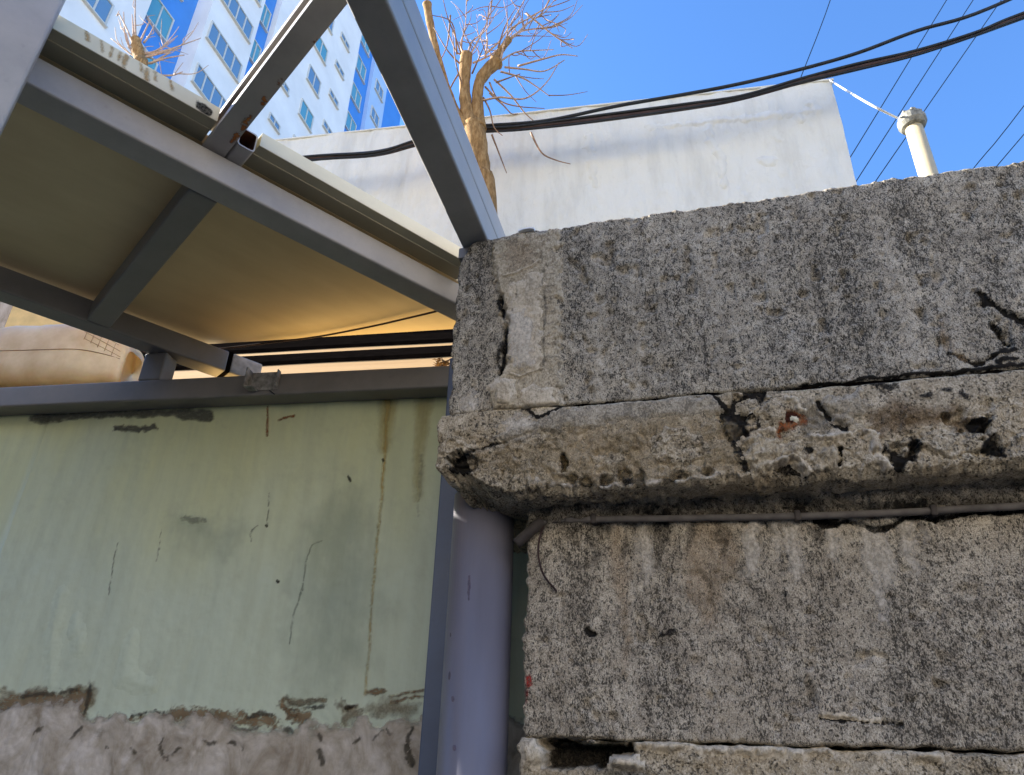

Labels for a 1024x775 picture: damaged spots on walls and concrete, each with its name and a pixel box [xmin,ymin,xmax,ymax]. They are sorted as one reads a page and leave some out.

crack [496,297,511,376]
crack [788,289,1024,391]
crack [522,392,722,419]
spalling [449,387,923,489]
rust [777,411,807,437]
hole [945,416,1007,458]
peeling [0,685,95,717]
peeling [125,697,326,732]